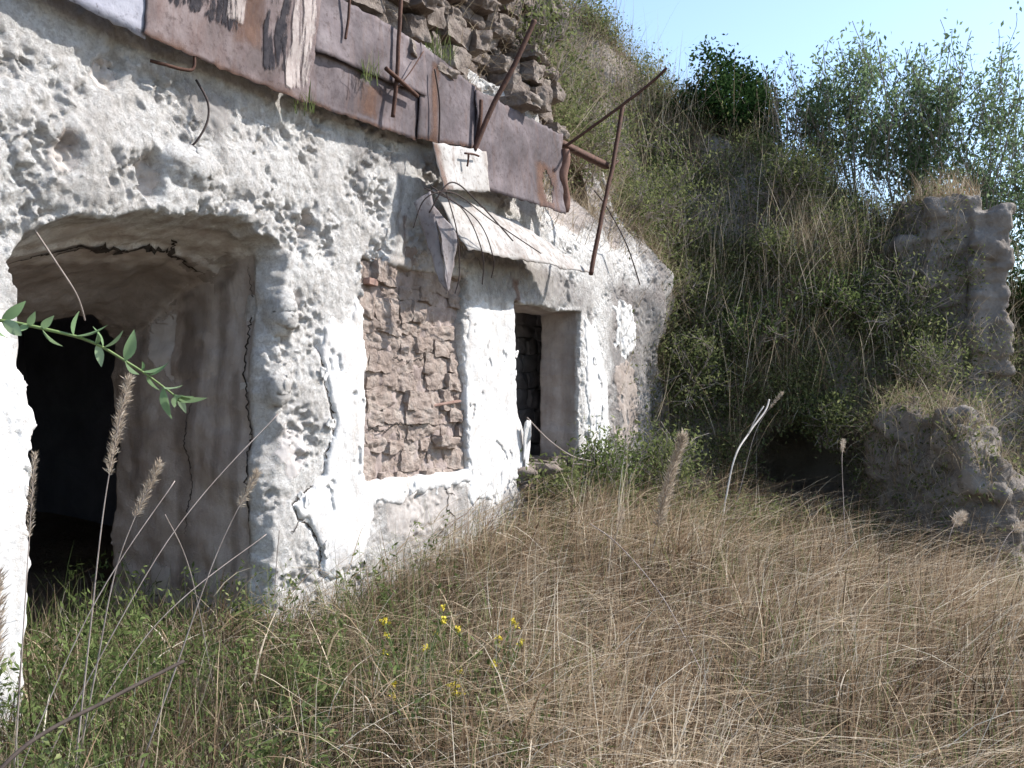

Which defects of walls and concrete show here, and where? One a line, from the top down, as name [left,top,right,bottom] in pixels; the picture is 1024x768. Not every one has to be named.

crack [7,239,205,274]
crack [242,267,253,555]
flaking render [292,300,531,582]